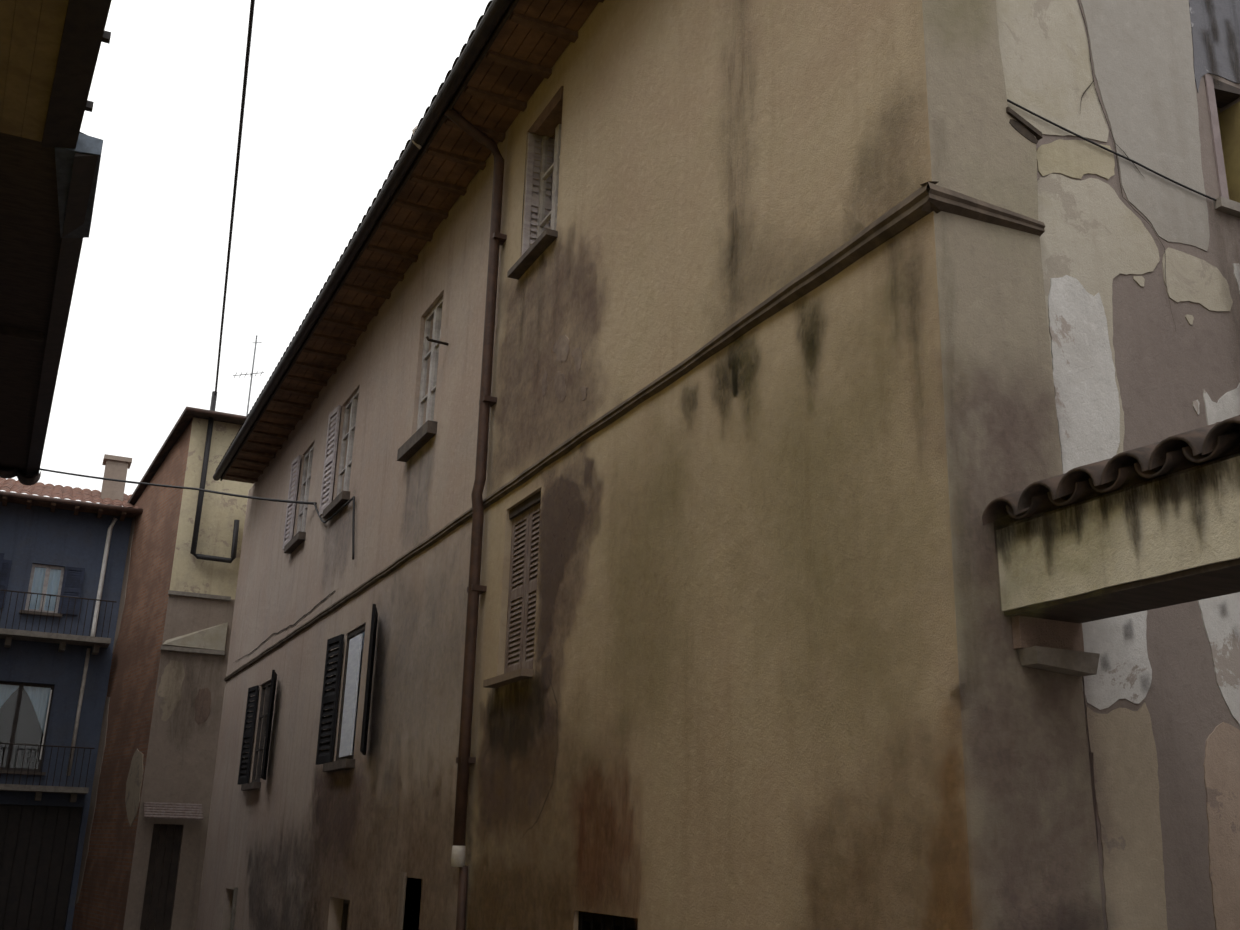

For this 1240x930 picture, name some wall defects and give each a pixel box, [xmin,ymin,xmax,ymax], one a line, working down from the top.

leakage [498,253,597,466]
leakage [975,453,1240,577]
peeling [996,0,1240,474]
crack [1078,0,1176,331]
flaking render [1082,610,1168,930]
flaking render [1197,592,1240,930]